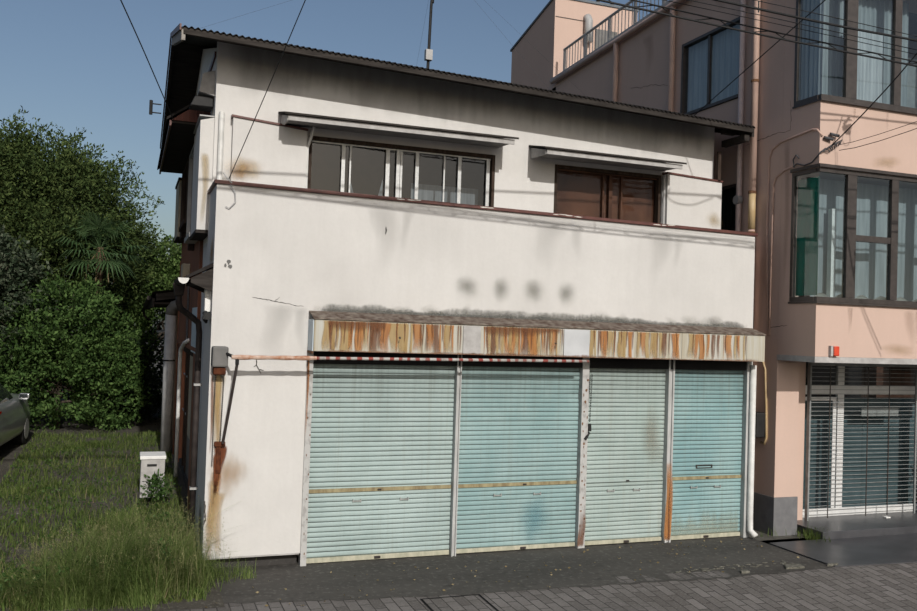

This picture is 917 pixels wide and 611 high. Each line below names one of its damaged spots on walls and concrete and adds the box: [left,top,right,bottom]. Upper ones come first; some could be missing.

rust [322,321,755,362]
rust [211,375,222,432]
rust [207,447,228,538]
rust [664,471,672,539]